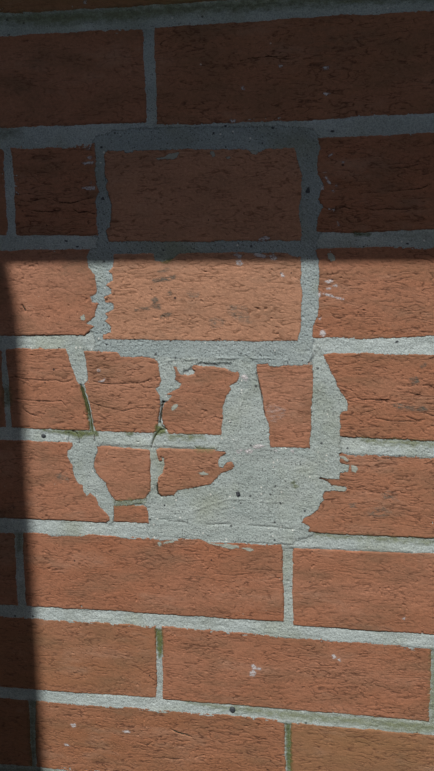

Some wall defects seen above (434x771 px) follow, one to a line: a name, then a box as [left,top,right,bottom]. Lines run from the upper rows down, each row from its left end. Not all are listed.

crack [17,377,149,443]